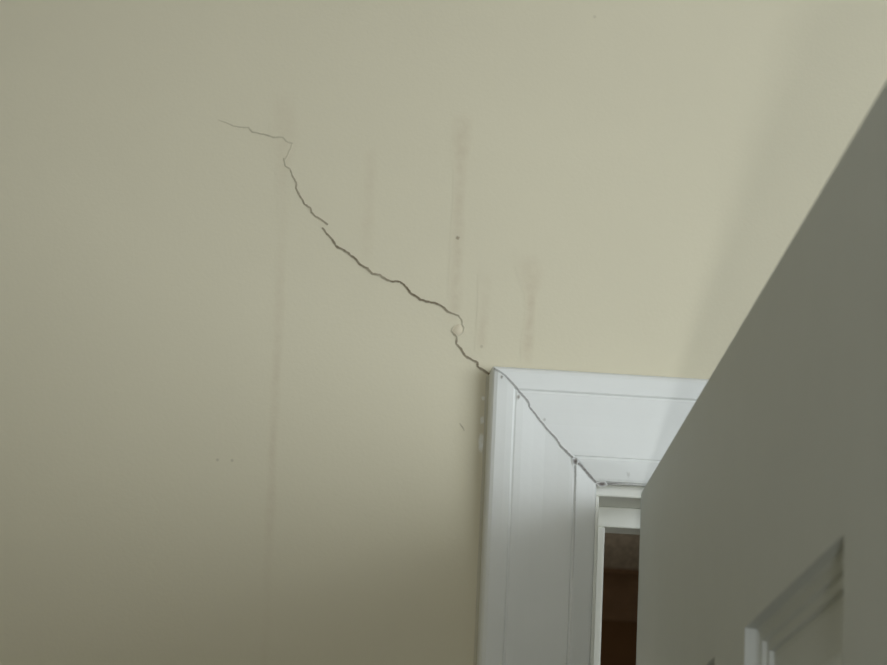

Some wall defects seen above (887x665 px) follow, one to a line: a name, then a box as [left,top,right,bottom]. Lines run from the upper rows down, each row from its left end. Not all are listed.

crack [218,119,646,578]